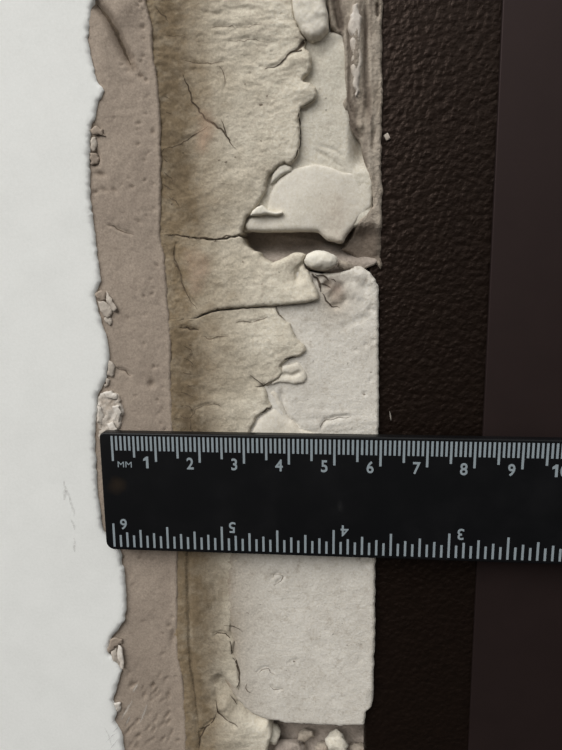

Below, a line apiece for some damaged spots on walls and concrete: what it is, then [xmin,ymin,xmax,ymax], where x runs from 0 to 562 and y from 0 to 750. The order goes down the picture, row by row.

spalling [97,5,131,65]
crack [265,39,307,69]
crack [161,60,236,206]
peeling [270,164,292,184]
peeling [250,205,283,216]
spalling [243,229,377,307]
peeling [95,290,117,326]
crack [180,303,302,431]
peeling [96,361,124,439]
peeling [107,637,124,670]
crack [199,625,250,747]
spalling [268,720,364,750]